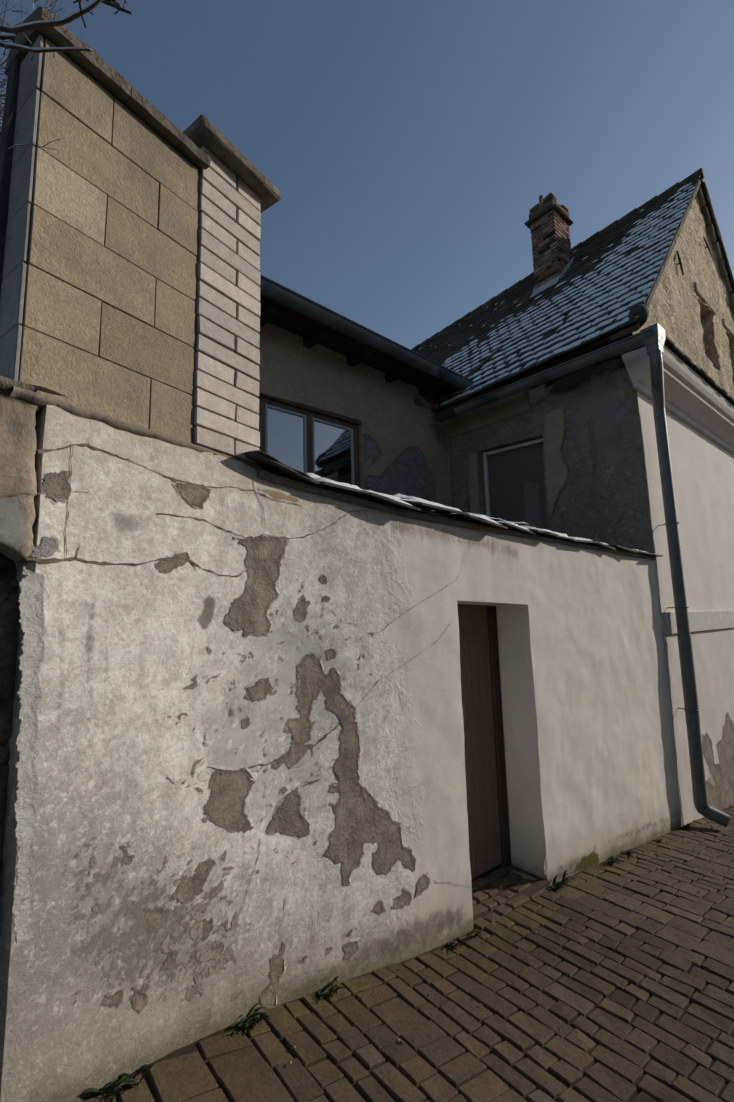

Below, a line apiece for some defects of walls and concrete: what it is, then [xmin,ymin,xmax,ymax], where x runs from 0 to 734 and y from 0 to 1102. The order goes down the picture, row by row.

peeling [40,470,71,505]
crack [0,437,366,577]
spalling [365,446,469,520]
crack [307,542,475,637]
peeling [12,536,61,943]
peeling [100,533,431,1019]
crack [249,623,451,768]
peeling [702,712,734,810]